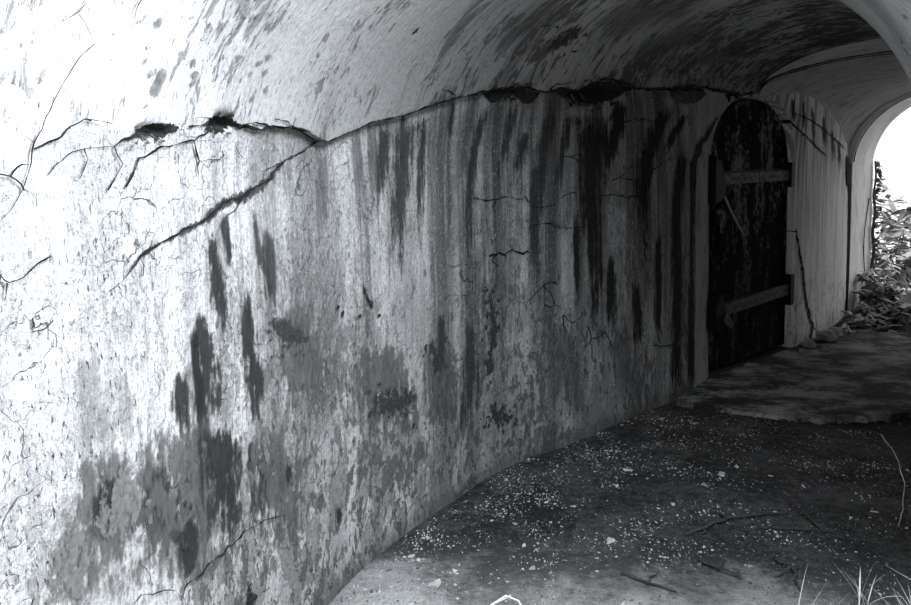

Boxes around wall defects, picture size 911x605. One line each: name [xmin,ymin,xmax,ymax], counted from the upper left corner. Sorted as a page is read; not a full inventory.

spalling [130,112,257,145]
water stain [353,116,426,271]
crack [0,0,911,311]
water stain [465,112,487,248]
spalling [484,82,540,104]
water stain [497,101,642,387]
spalling [556,76,635,114]
water stain [636,108,688,237]
water stain [654,113,722,386]
water stain [54,212,305,604]
water stain [352,317,482,438]
crack [134,515,285,604]